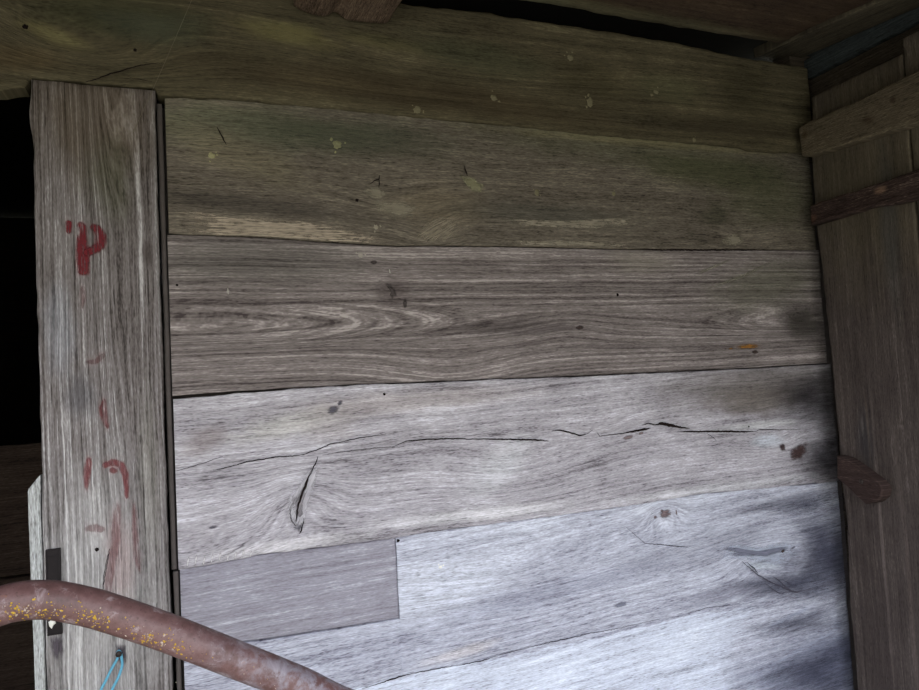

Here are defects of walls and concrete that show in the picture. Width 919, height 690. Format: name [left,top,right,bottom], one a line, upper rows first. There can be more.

crack [177,422,794,534]